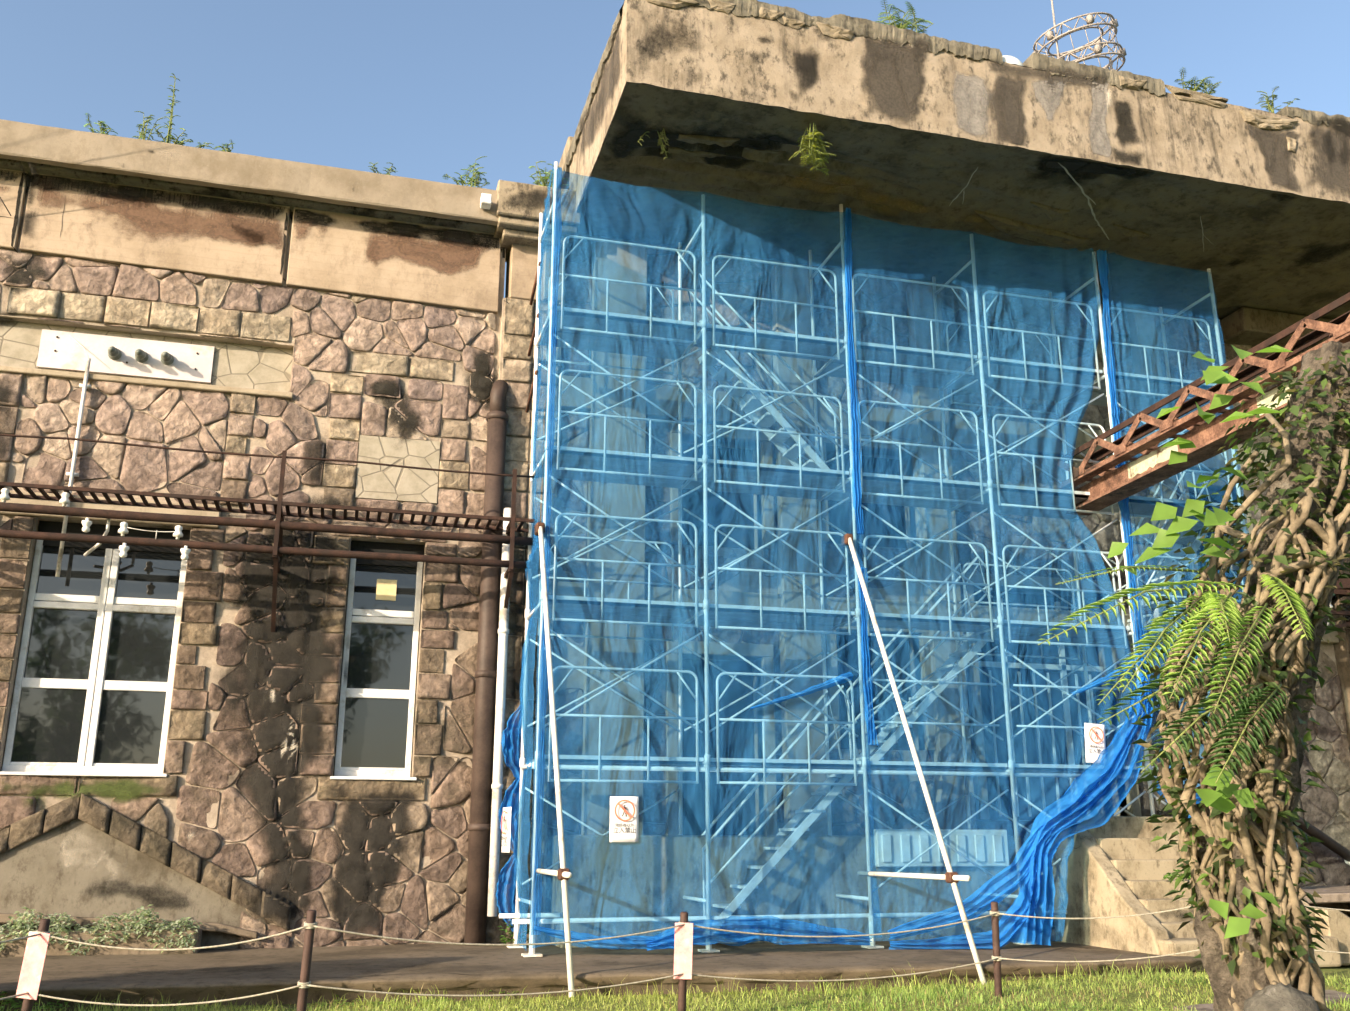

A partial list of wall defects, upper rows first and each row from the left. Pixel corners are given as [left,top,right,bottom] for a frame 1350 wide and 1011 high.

water stain [795,53,817,90]
water stain [863,38,930,122]
water stain [956,61,1150,185]
water stain [1247,119,1350,201]
water stain [1298,243,1350,266]
water stain [371,381,418,438]
water stain [303,438,328,482]
water stain [306,496,350,516]
water stain [221,529,347,919]
water stain [330,789,414,935]